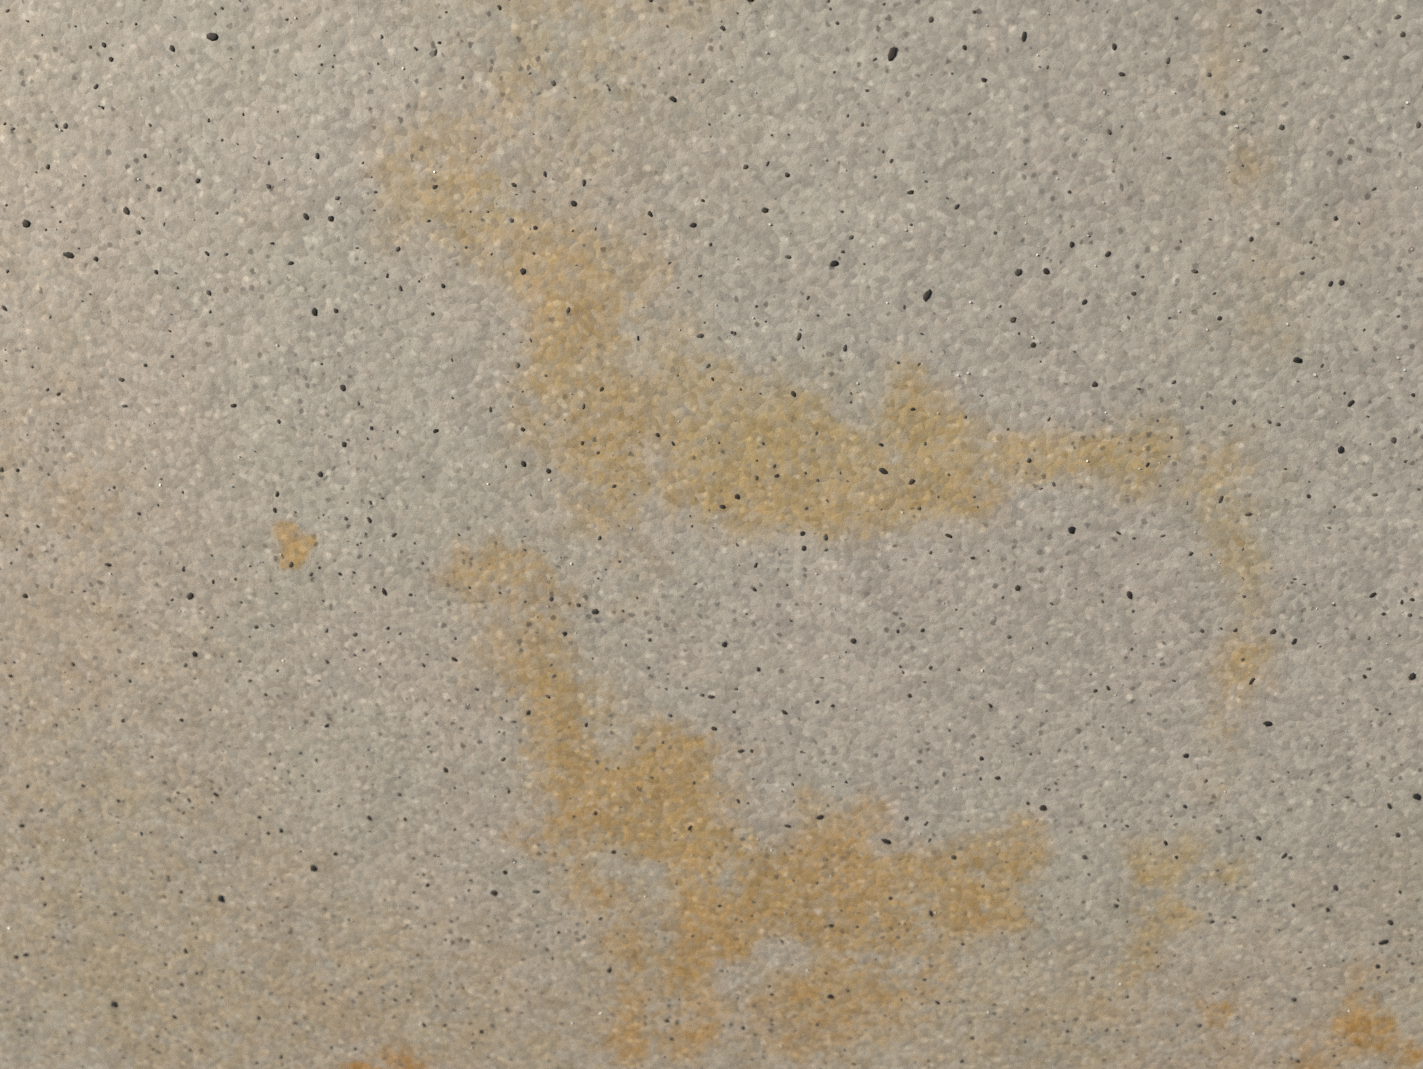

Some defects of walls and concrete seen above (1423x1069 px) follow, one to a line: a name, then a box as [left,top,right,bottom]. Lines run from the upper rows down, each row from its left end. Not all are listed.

corrosion [267,518,324,576]
corrosion [351,86,1309,1069]